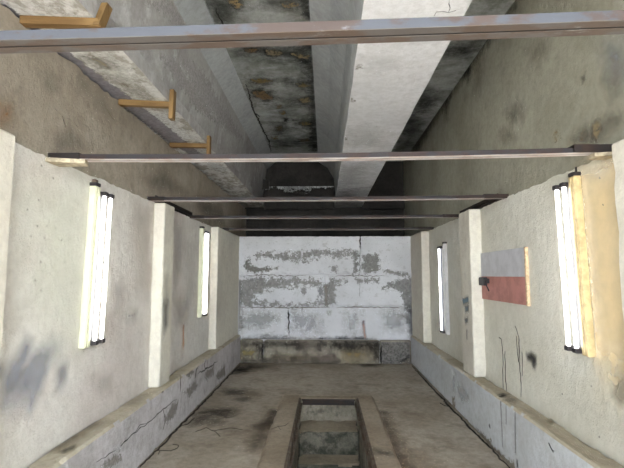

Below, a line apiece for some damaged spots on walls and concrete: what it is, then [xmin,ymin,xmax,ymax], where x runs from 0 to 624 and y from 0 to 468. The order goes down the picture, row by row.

crack [245,84,271,152]
leakage [237,45,318,151]
leakage [404,65,470,150]
crack [240,237,405,332]
peeling [239,248,412,325]
leakage [6,346,48,402]
crack [97,361,243,468]